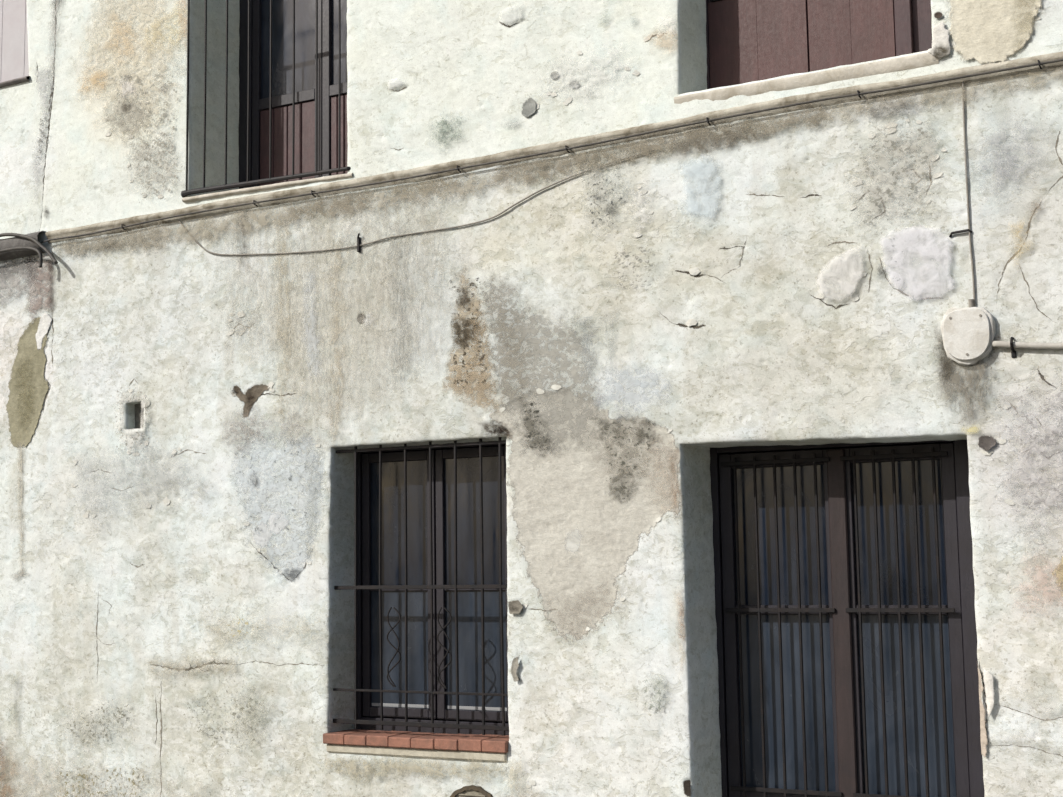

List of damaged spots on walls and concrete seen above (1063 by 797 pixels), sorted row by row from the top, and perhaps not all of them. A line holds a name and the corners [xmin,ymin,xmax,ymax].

peeling [928,0,1042,64]
crack [34,0,58,227]
crack [996,176,1063,322]
flaking render [6,313,52,540]
leakage [520,398,550,451]
peeling [484,278,682,642]
leakage [601,421,658,503]
flaking render [1030,558,1063,606]
crack [151,657,323,797]